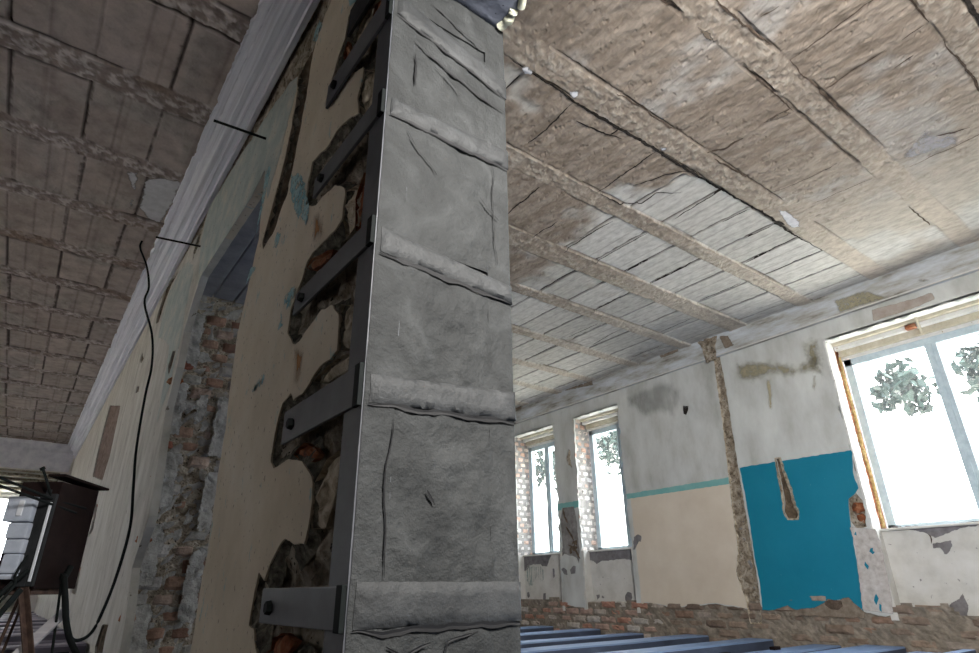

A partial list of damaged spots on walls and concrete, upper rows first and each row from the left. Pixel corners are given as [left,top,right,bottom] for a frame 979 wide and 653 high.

crack [716,0,779,45]
crack [790,0,979,116]
crack [912,127,978,166]
spalling [158,212,208,322]
spalling [218,0,381,653]
spalling [94,406,120,480]
flaking render [129,295,243,653]
flaking render [520,336,979,653]
spalling [97,615,121,653]